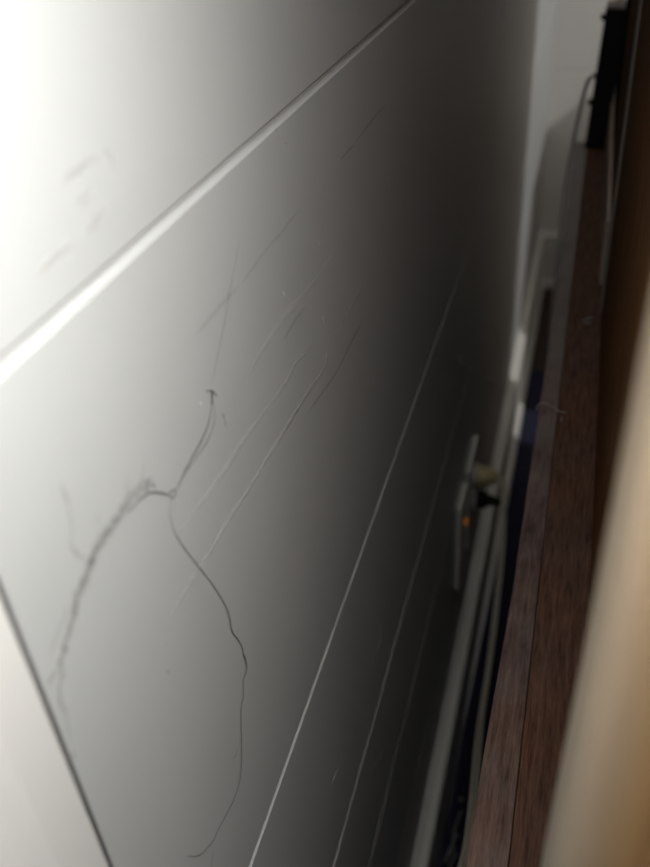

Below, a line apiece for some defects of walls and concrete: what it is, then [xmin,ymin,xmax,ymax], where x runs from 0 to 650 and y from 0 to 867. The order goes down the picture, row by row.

crack [131,391,224,509]
crack [171,522,247,707]